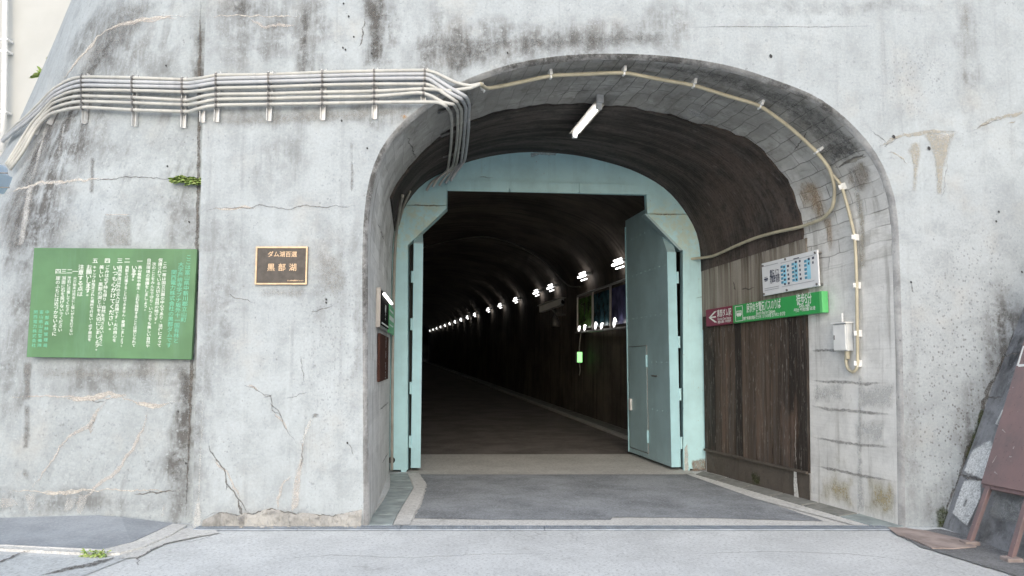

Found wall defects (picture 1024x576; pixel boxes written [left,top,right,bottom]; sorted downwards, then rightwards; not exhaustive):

crack [195,20,337,280]
crack [30,354,336,574]
spalling [202,508,362,528]